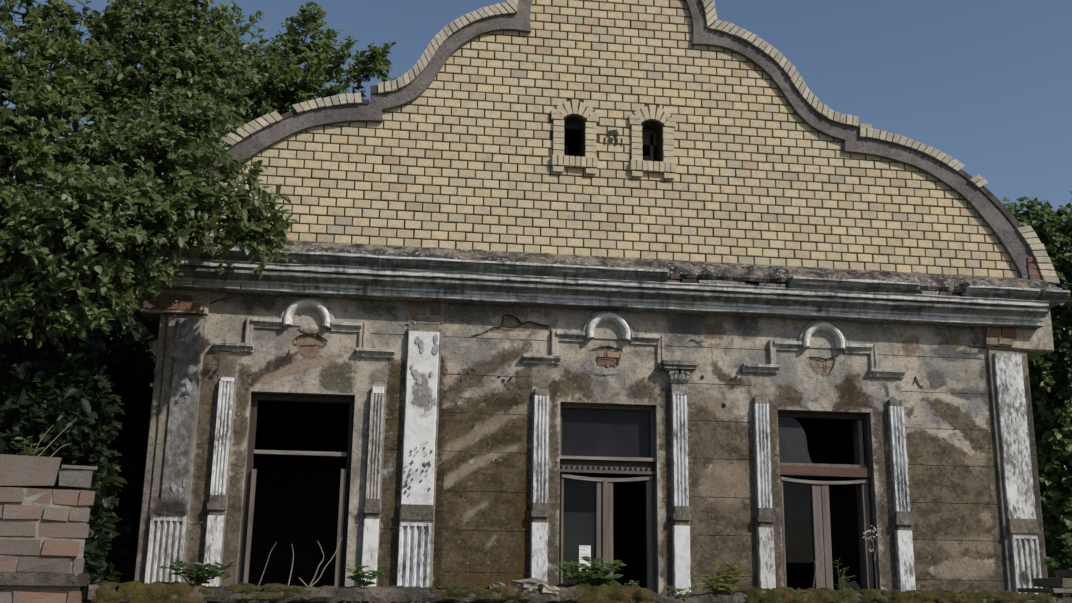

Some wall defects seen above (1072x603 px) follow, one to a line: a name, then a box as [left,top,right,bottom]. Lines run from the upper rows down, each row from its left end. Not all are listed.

peeling [257,335,343,384]
water stain [319,362,355,394]
peeling [410,364,436,416]
spalling [485,316,549,334]
spalling [983,327,1017,345]
water stain [432,340,594,589]
water stain [906,327,1006,593]